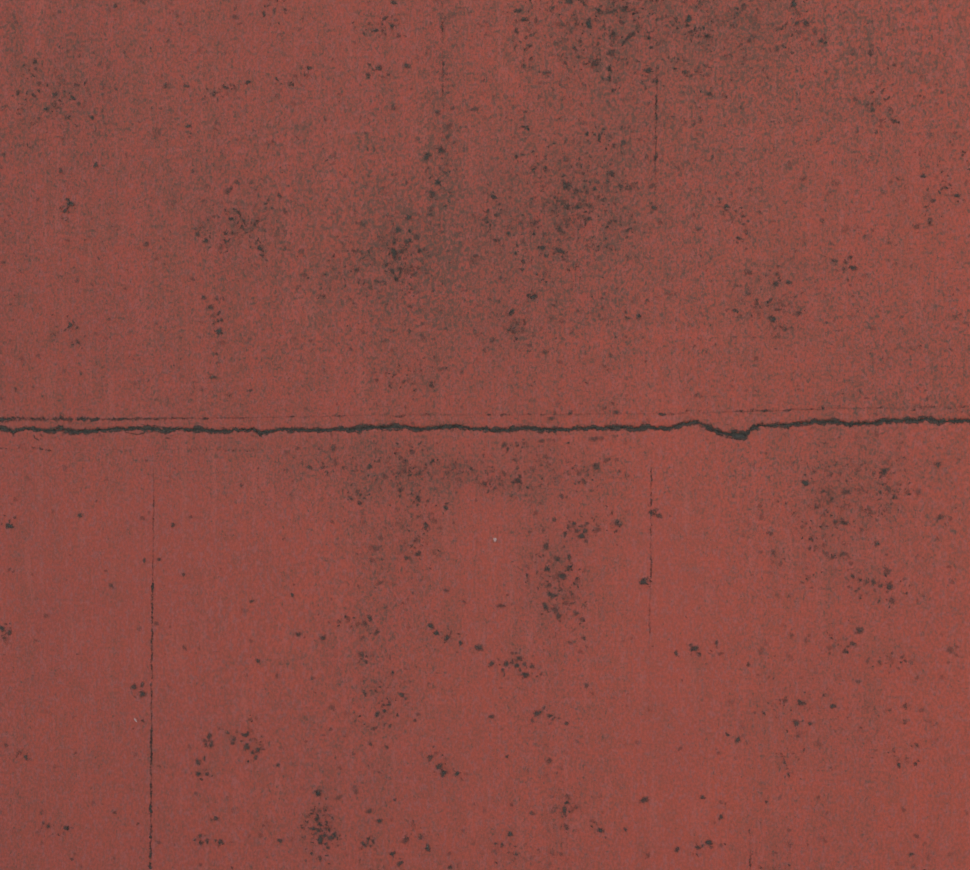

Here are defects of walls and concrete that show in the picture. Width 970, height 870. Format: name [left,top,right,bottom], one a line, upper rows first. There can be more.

crack [0,407,970,451]